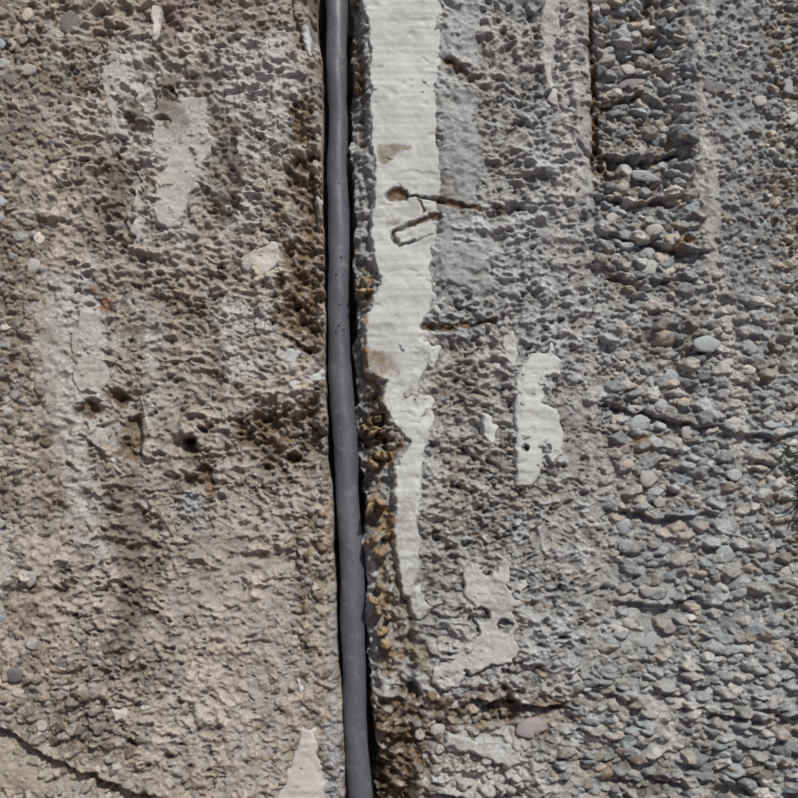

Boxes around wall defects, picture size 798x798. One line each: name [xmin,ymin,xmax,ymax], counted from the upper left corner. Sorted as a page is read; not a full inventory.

leakage [49,20,70,78]
leakage [99,0,310,272]
leakage [378,143,411,163]
crack [587,0,607,182]
leakage [203,276,288,394]
leakage [389,546,532,683]